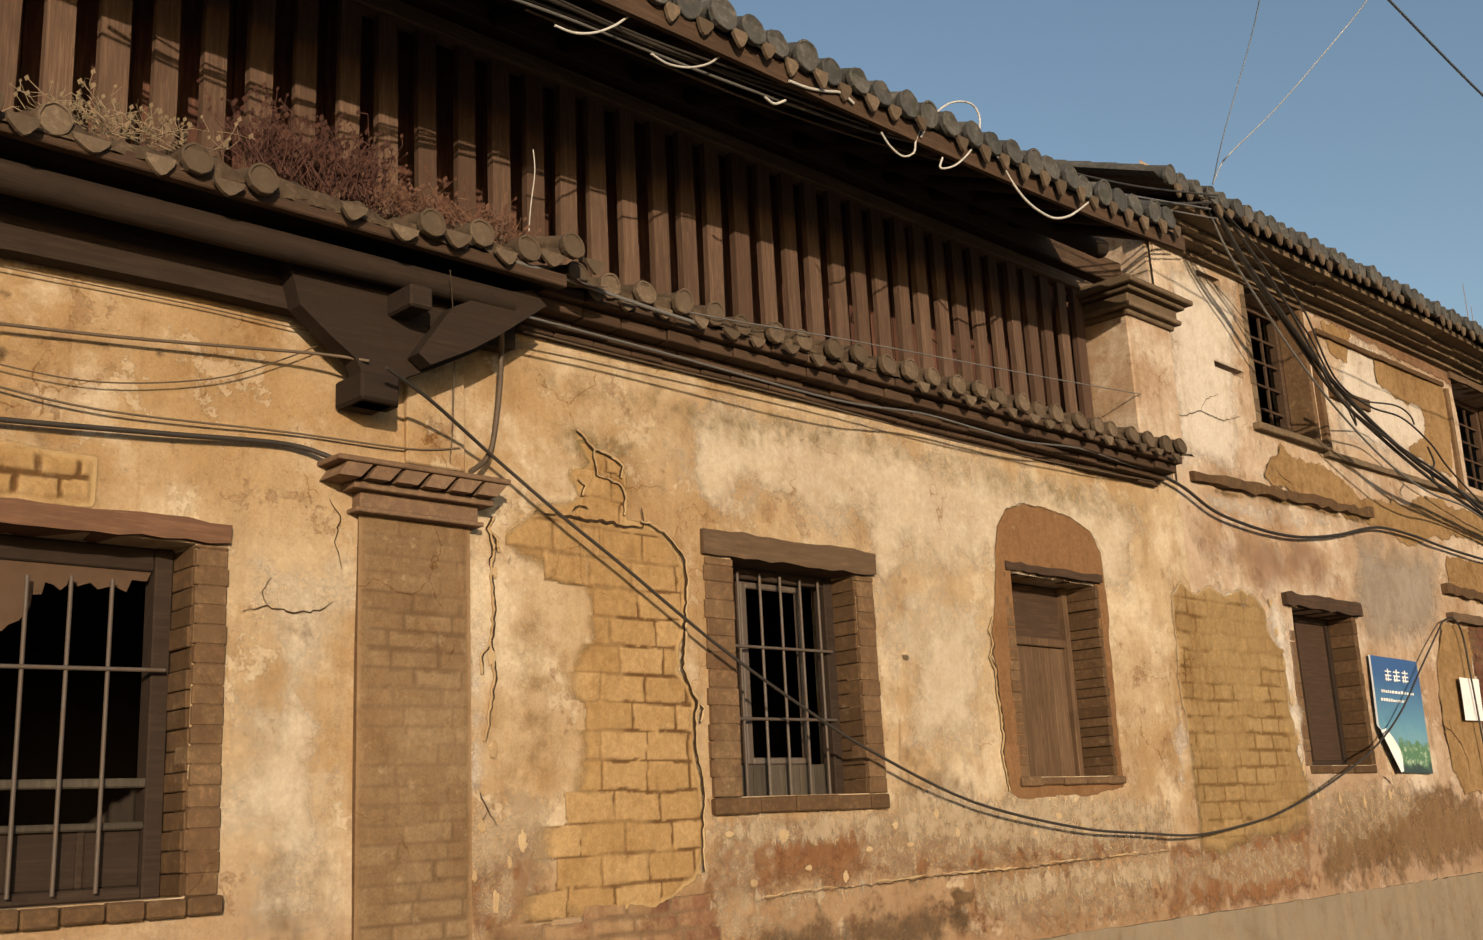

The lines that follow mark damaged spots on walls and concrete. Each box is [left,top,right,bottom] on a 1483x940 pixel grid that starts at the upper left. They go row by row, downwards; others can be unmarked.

crack [1180,394,1238,421]
spalling [1373,351,1453,477]
spalling [0,441,98,507]
crack [243,500,342,614]
spalling [1263,443,1483,604]
spalling [472,429,1418,940]
spalling [1437,623,1483,808]
leakage [1324,786,1483,887]
leakage [763,908,968,940]